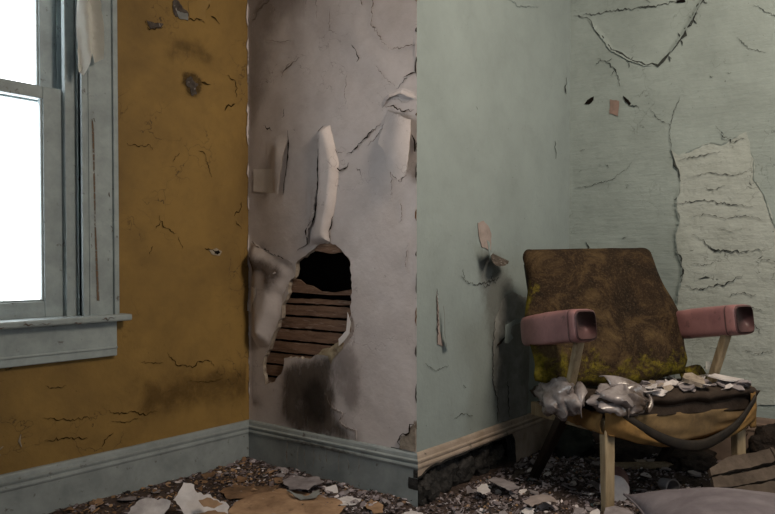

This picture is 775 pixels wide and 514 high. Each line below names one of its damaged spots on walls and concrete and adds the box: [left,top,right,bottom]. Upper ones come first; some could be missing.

crack [361,0,414,49]
crack [578,0,706,85]
flaking render [263,242,352,385]
crack [299,124,384,249]
peeling [478,221,509,266]
flaking render [669,98,775,405]